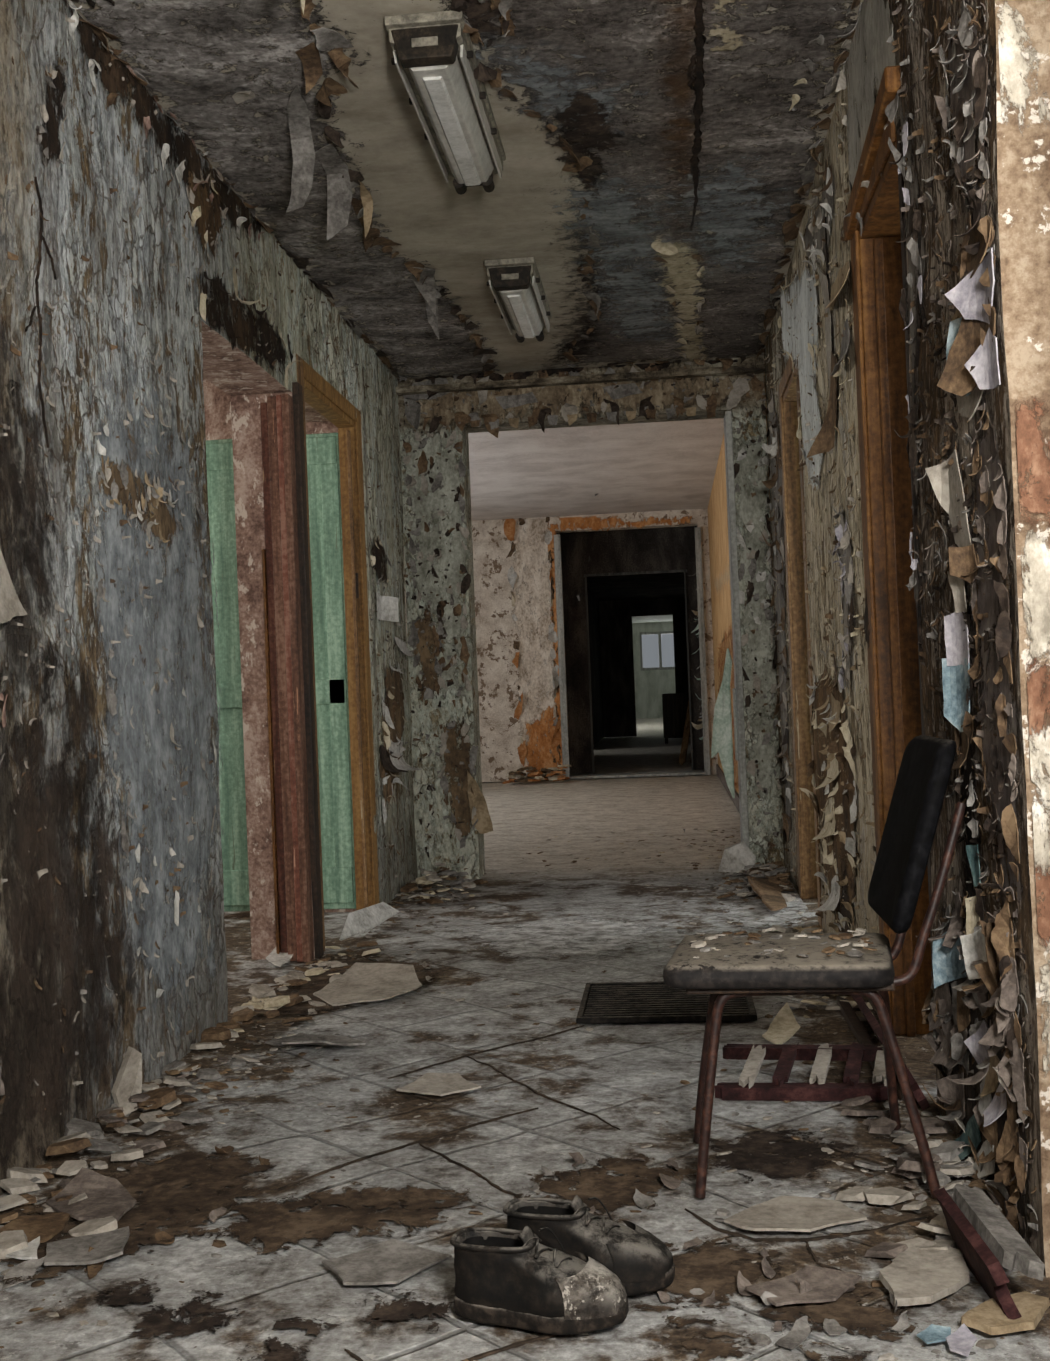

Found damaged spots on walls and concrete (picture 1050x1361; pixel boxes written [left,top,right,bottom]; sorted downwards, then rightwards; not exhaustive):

spalling [34,61,81,168]
flaking render [997,2,1050,133]
peeling [0,662,45,728]
peeling [25,327,223,1061]
peeling [711,630,739,798]
flaking render [1015,397,1050,1077]
crack [278,1025,620,1198]
peeling [209,1197,244,1223]
peeling [633,1189,655,1208]
crack [344,1348,363,1361]
crack [461,1334,557,1361]